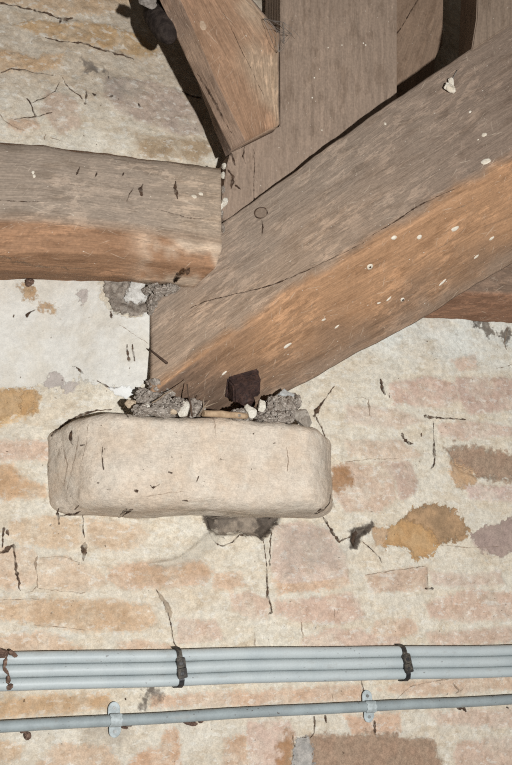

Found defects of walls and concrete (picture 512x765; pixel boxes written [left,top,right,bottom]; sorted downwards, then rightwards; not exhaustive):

crack [0,2,133,59]
crack [0,68,87,126]
peeling [0,279,151,419]
crack [313,386,335,436]
crack [401,415,466,469]
crack [0,528,40,600]
crack [209,518,273,614]
crack [316,494,428,580]